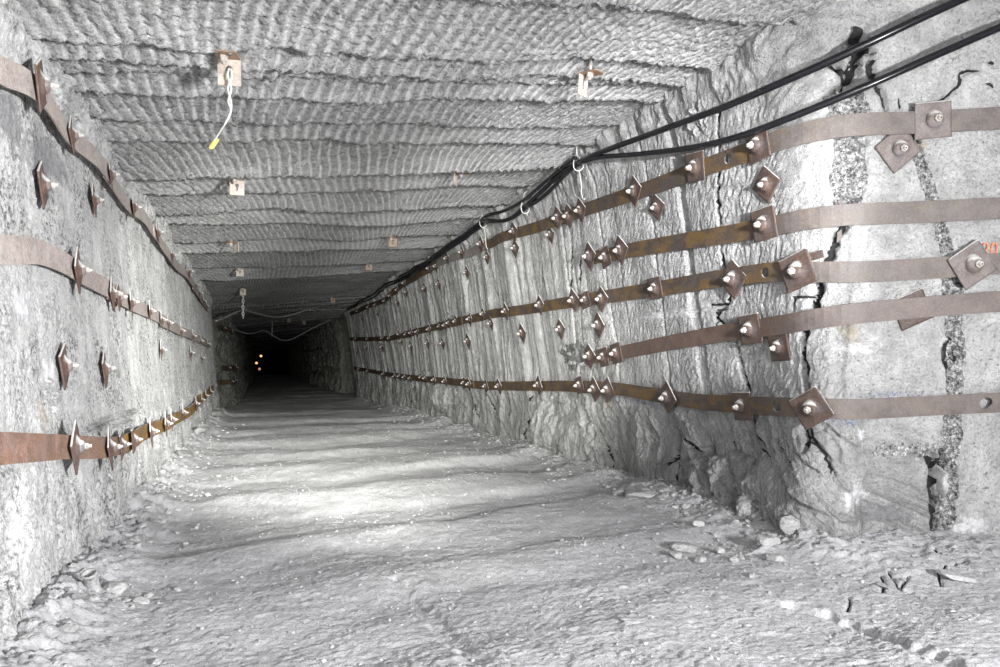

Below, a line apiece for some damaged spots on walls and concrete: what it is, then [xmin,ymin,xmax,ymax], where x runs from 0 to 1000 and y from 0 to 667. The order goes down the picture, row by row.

crack [938,61,994,101]
crack [715,173,723,223]
crack [712,293,731,324]
crack [793,226,846,381]
crack [943,336,956,370]
crack [925,452,964,587]